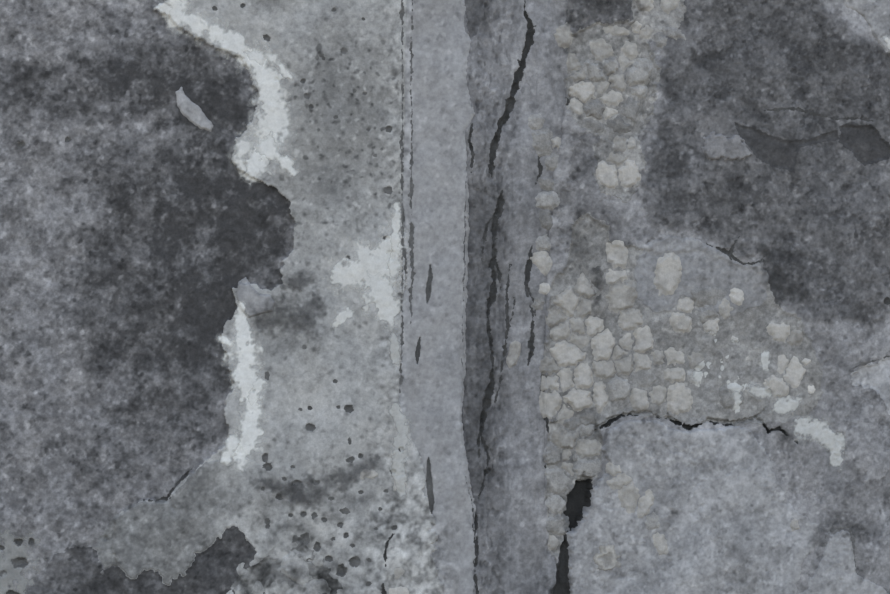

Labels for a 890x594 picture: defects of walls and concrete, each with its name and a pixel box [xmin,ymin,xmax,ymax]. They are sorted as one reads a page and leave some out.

spalling [0,0,371,594]
crack [398,0,416,393]
crack [465,1,544,594]
spalling [554,0,687,203]
spalling [701,122,890,173]
flaking render [843,0,890,115]
crack [599,413,733,430]
spalling [539,212,890,594]
crack [762,408,798,444]